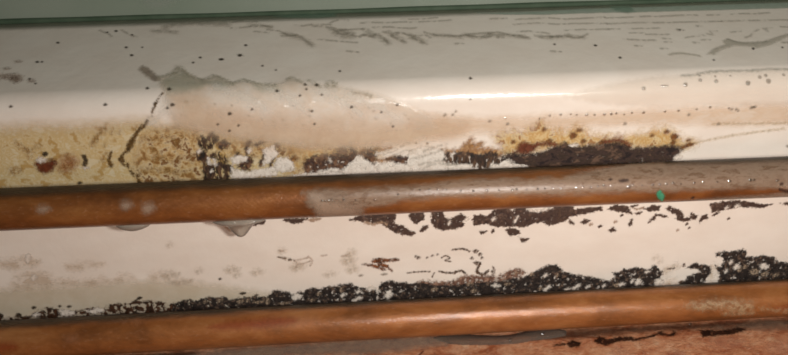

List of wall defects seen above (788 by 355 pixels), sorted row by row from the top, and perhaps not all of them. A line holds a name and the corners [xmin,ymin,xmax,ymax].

crack [107,93,163,183]
damp [0,124,413,188]
peeling [350,199,788,243]